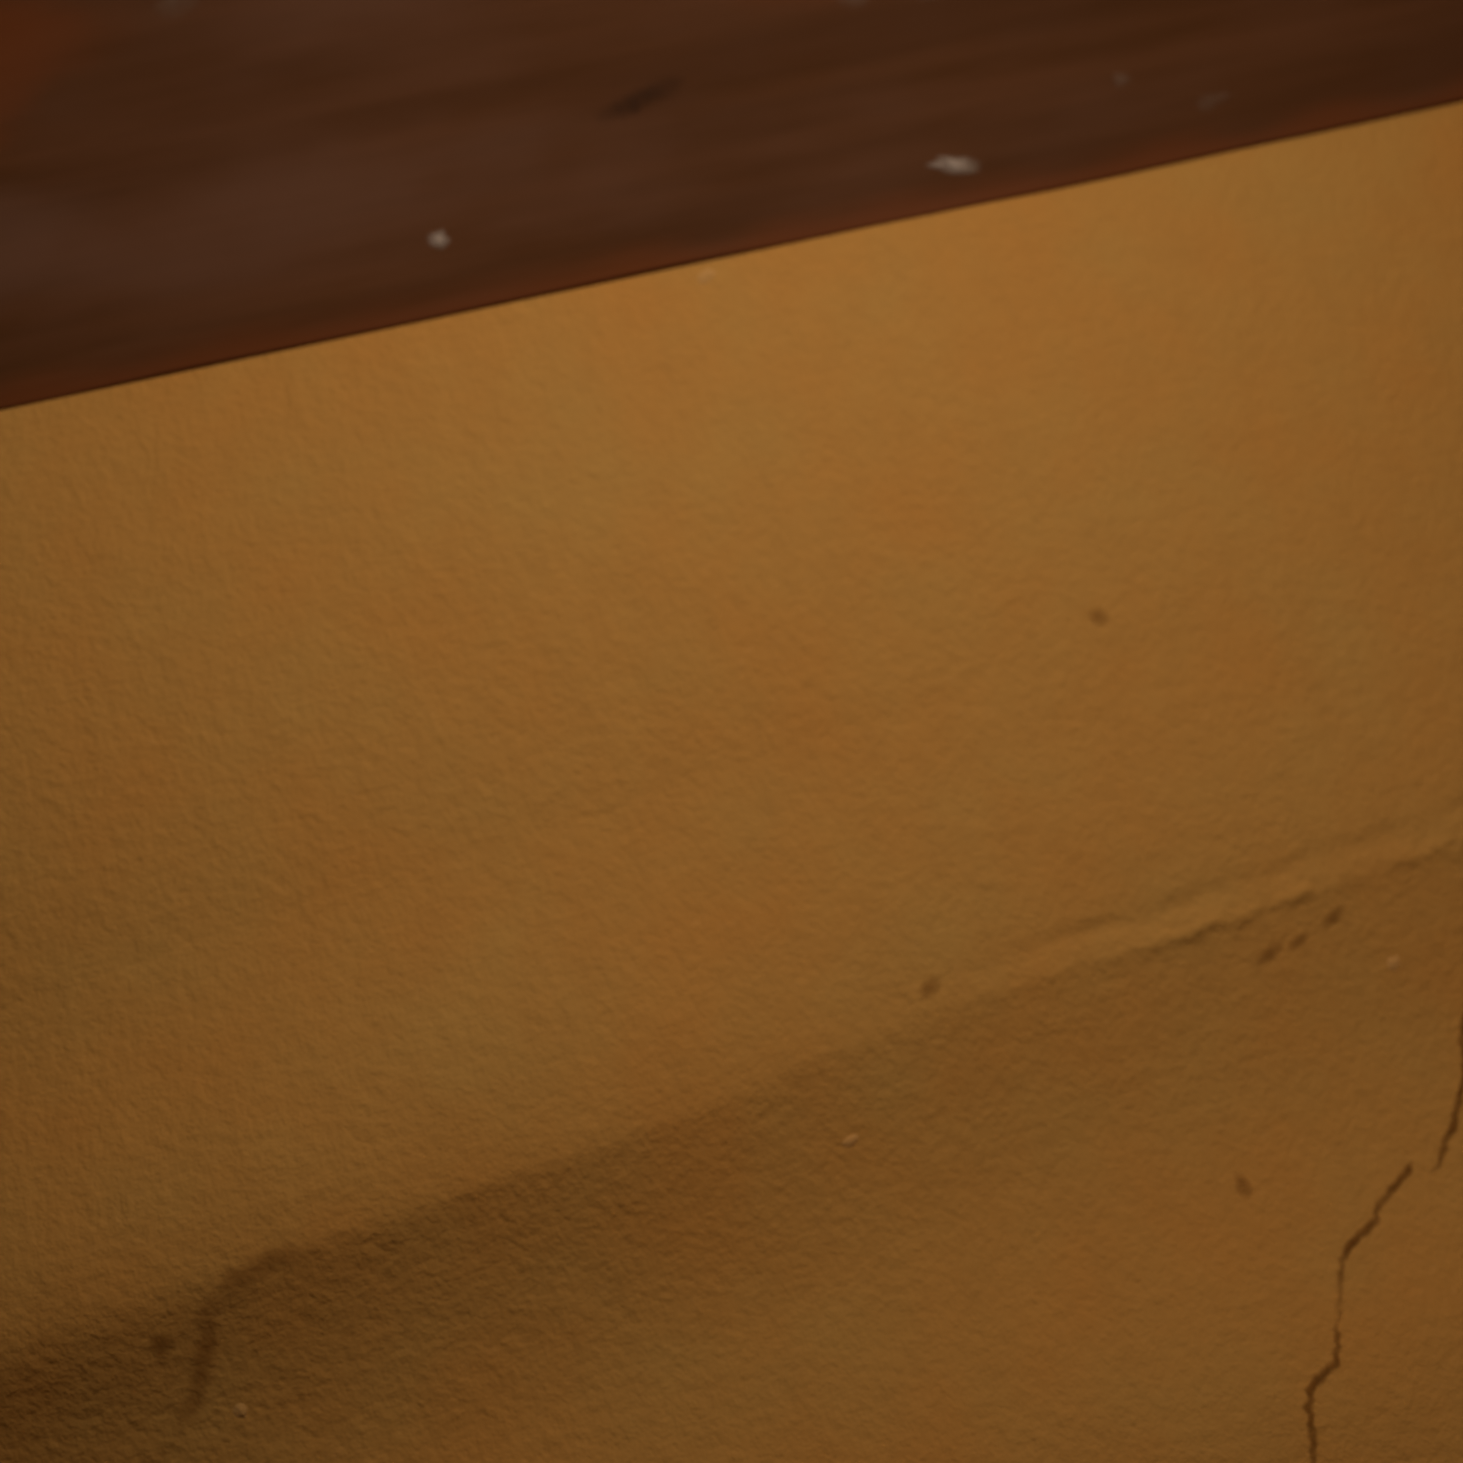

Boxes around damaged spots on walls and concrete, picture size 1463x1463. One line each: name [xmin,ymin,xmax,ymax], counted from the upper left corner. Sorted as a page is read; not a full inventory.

crack [1344,1023,1463,1256]
crack [1305,1334,1340,1452]